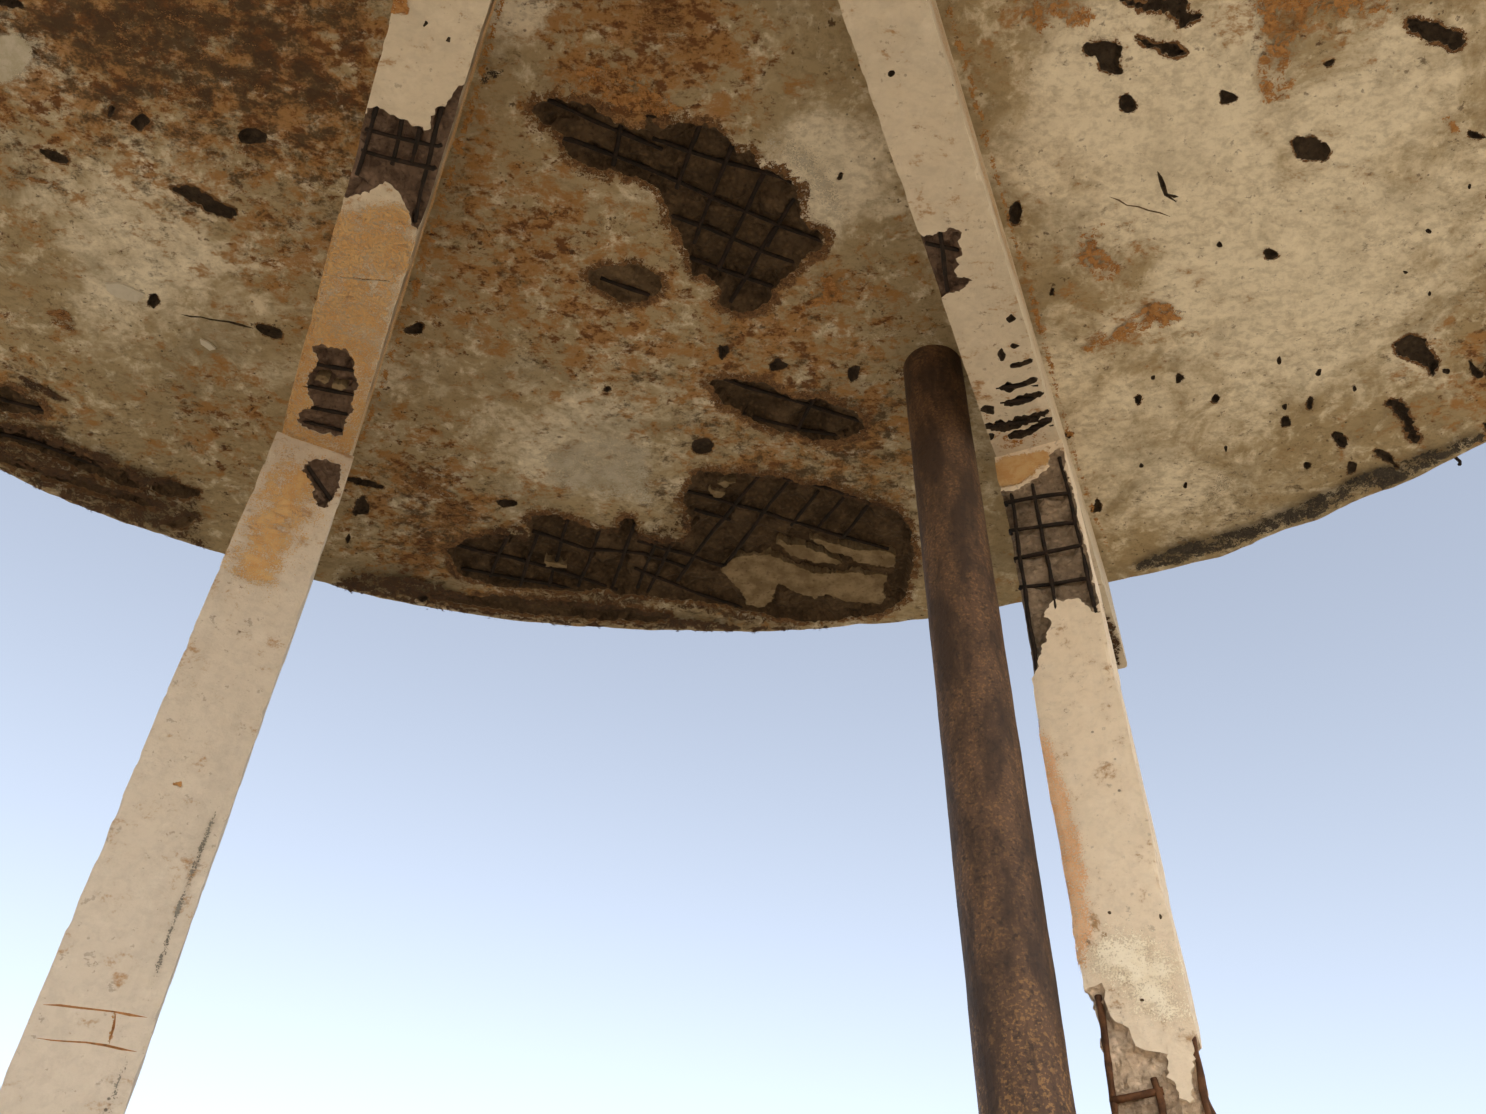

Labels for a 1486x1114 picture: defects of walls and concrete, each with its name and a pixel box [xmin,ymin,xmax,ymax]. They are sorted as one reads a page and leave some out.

spalling [345,85,464,229]
spalling [520,85,836,322]
spalling [254,322,284,340]
spalling [297,343,359,437]
spalling [699,345,875,449]
damp [0,422,205,549]
spalling [417,437,923,628]
spalling [980,343,1104,674]
crack [38,1004,147,1052]
spalling [1084,983,1216,1114]